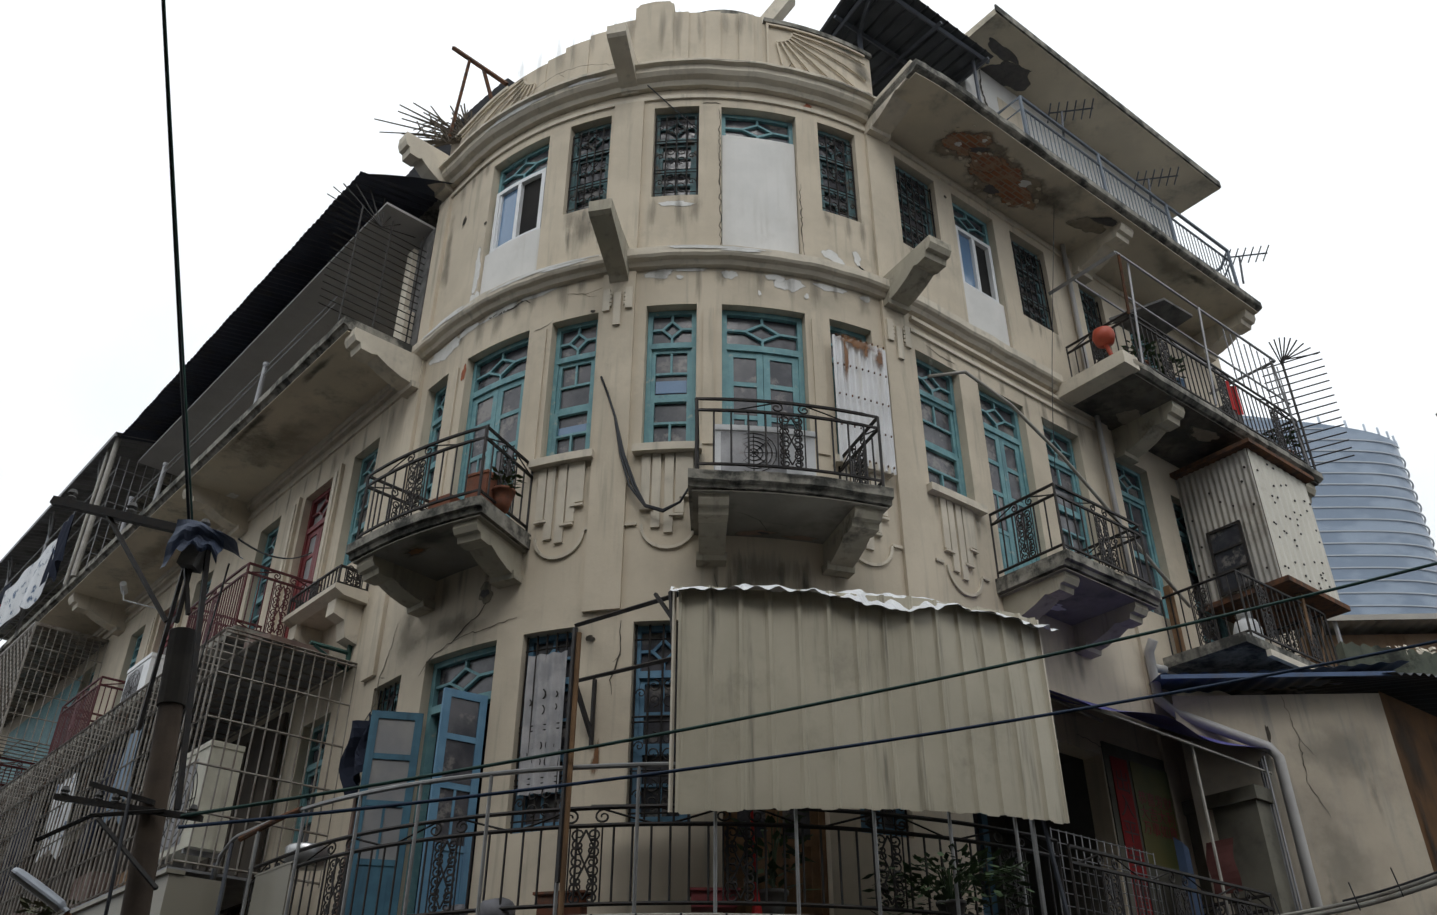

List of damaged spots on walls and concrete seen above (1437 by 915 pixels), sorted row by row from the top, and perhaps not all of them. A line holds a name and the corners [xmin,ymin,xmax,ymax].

spalling [980,37,1031,91]
spalling [934,125,1047,210]
crack [1281,696,1331,817]